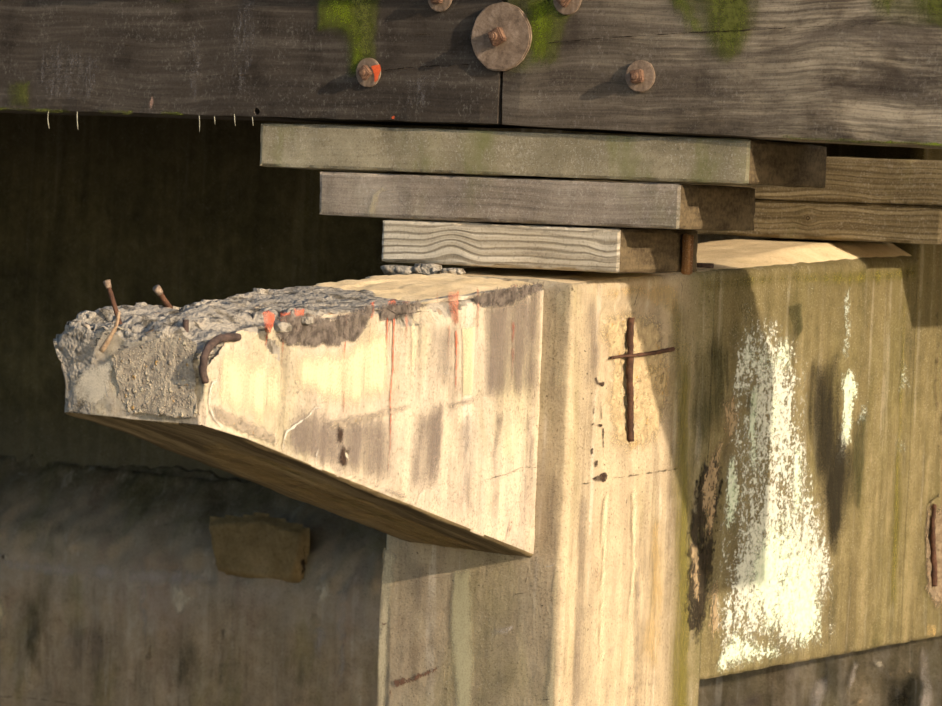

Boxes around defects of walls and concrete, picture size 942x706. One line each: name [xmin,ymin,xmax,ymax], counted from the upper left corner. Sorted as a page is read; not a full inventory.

spalling [99,311,242,418]
rust [386,301,408,465]
rust [448,291,459,384]
peeling [685,396,740,644]
damp [718,290,866,670]
spalling [926,495,942,607]